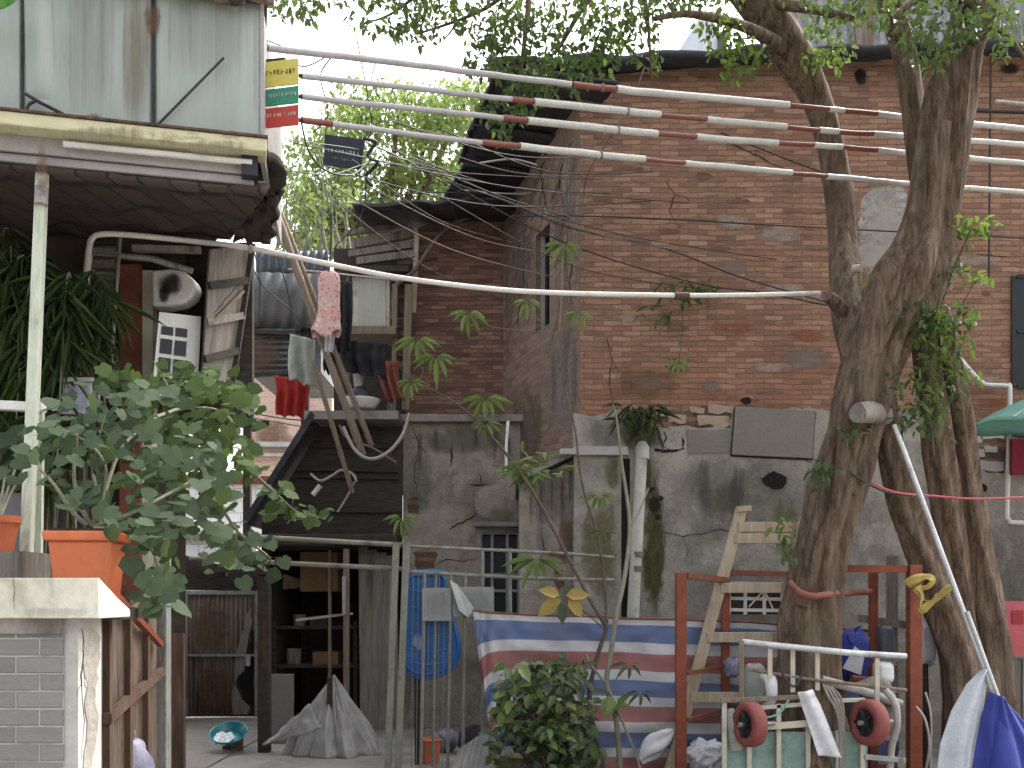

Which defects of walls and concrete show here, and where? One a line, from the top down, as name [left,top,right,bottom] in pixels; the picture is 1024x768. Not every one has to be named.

corrosion [146,8,160,32]
spalling [647,404,734,428]
damp [646,460,662,595]
crack [664,529,729,561]
crack [77,630,85,759]